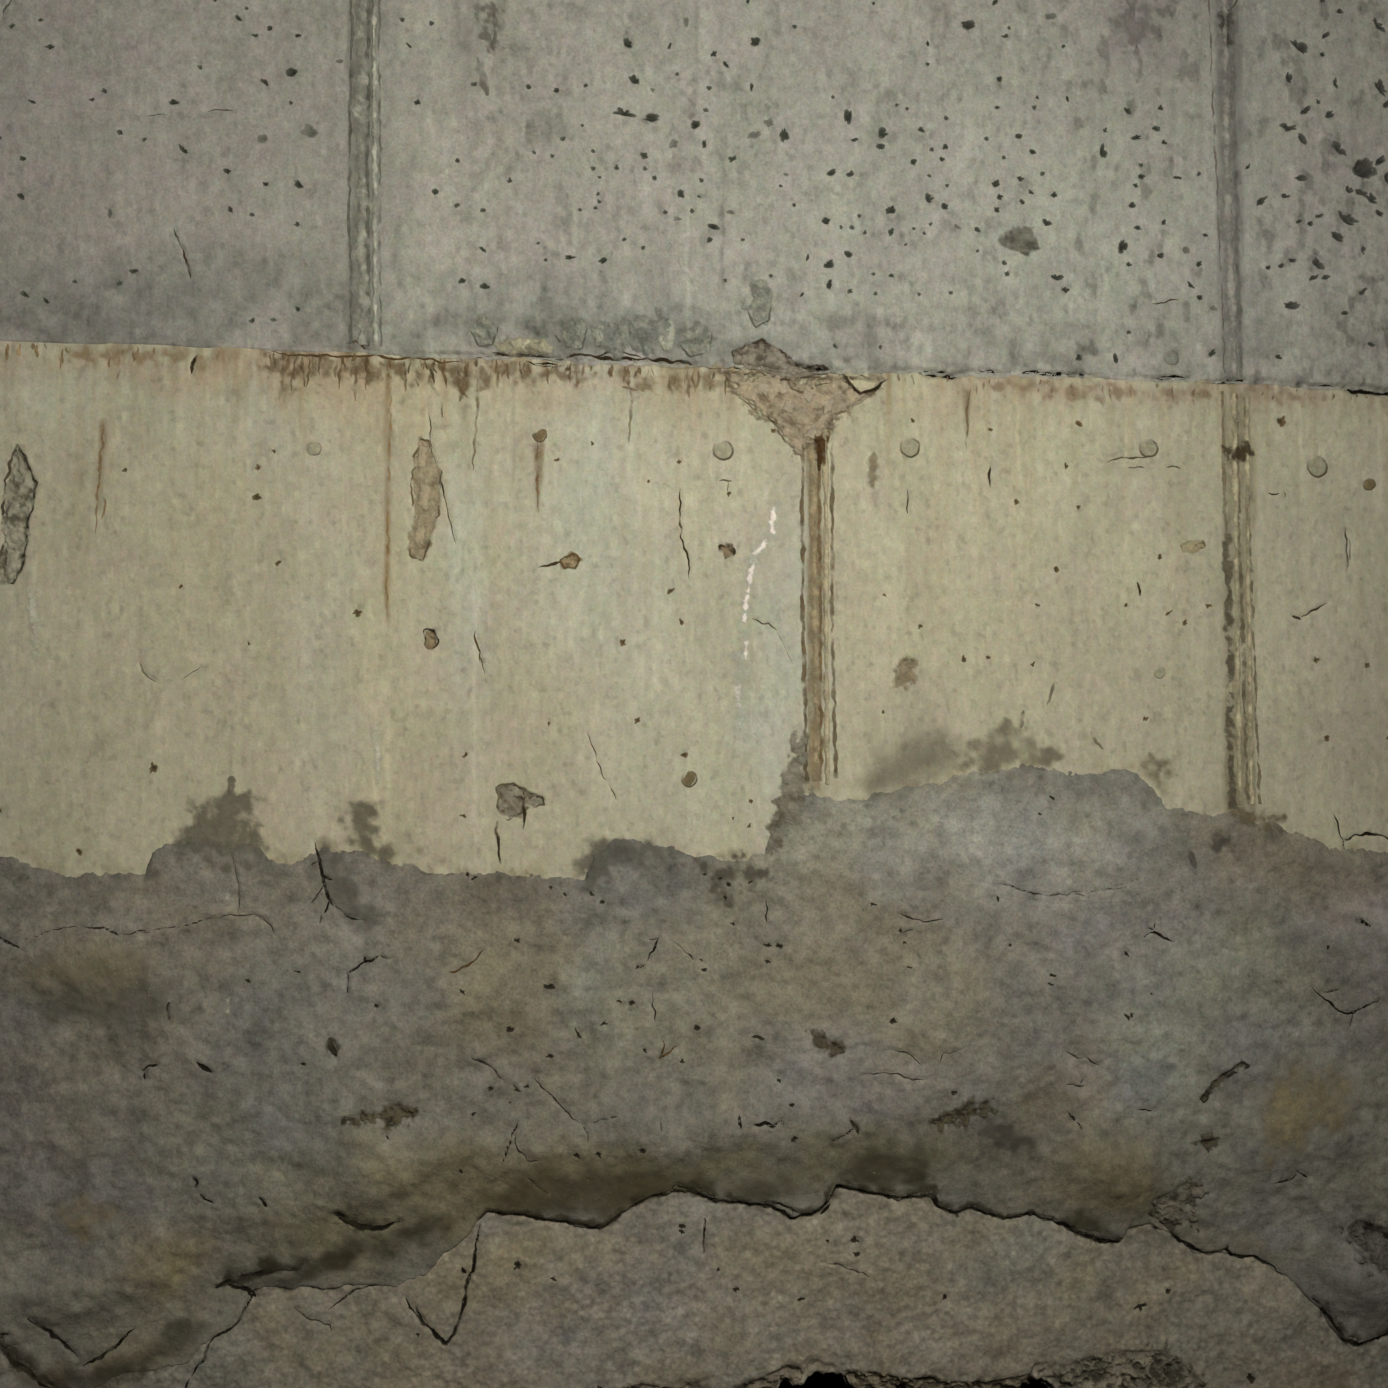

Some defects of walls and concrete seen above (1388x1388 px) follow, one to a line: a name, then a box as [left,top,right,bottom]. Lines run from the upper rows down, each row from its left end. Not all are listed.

rust [6,343,119,379]
rust [265,353,653,418]
rust [669,369,727,395]
spalling [0,446,38,584]
leakage [871,710,1062,788]
leakage [176,776,261,872]
spalling [495,782,545,862]
peeling [732,733,813,855]
leakage [253,1217,442,1287]
crack [296,1124,1123,1345]
crack [1150,1215,1283,1275]
crack [0,1318,135,1388]